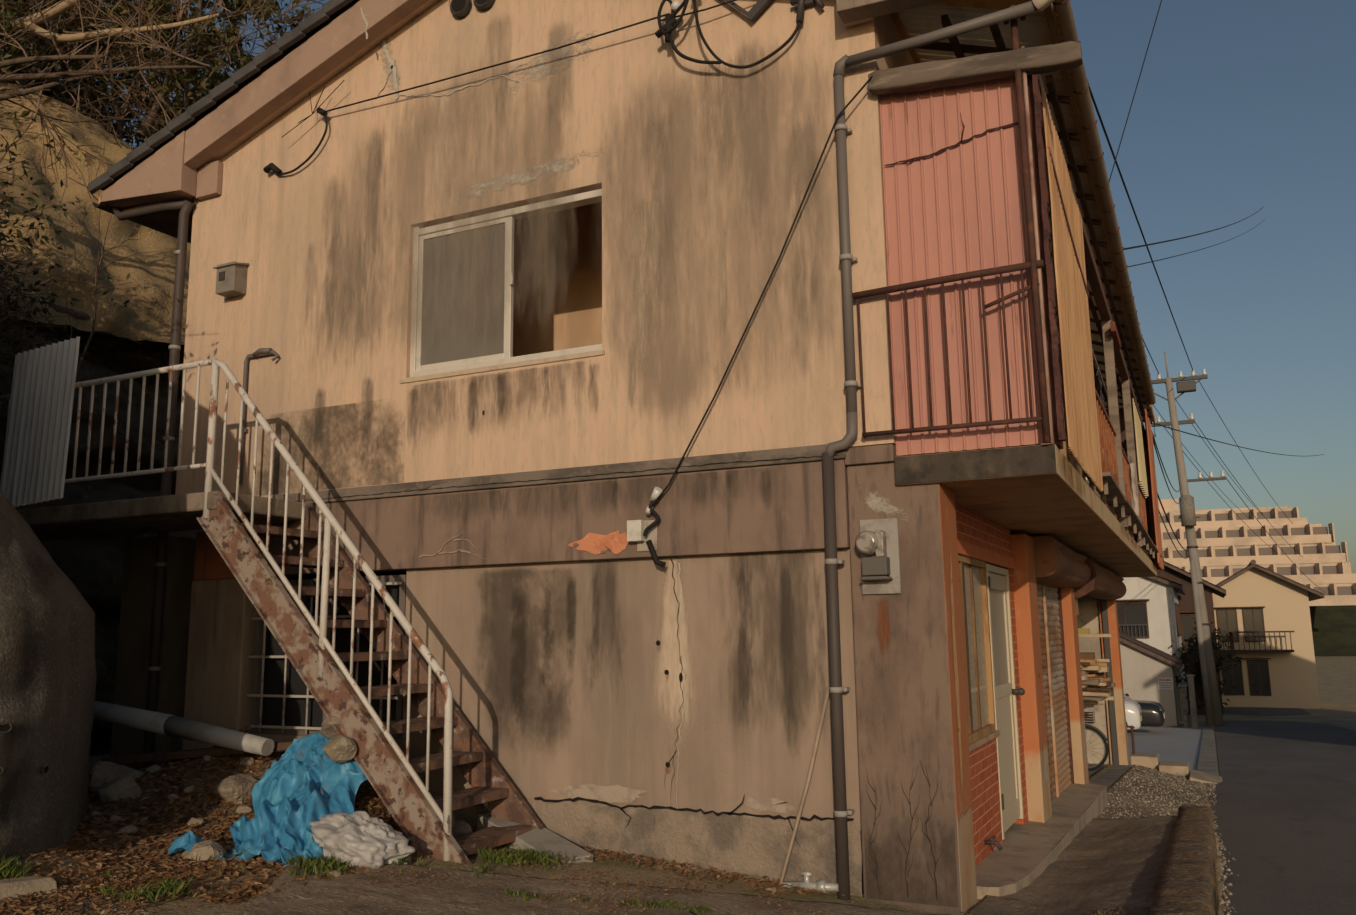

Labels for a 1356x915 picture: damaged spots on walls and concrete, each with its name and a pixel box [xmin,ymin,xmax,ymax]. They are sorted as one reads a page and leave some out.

crack [885,112,1018,167]
damp [261,404,359,495]
spalling [568,530,629,555]
damp [485,571,560,733]
damp [552,581,575,639]
crack [534,559,973,900]